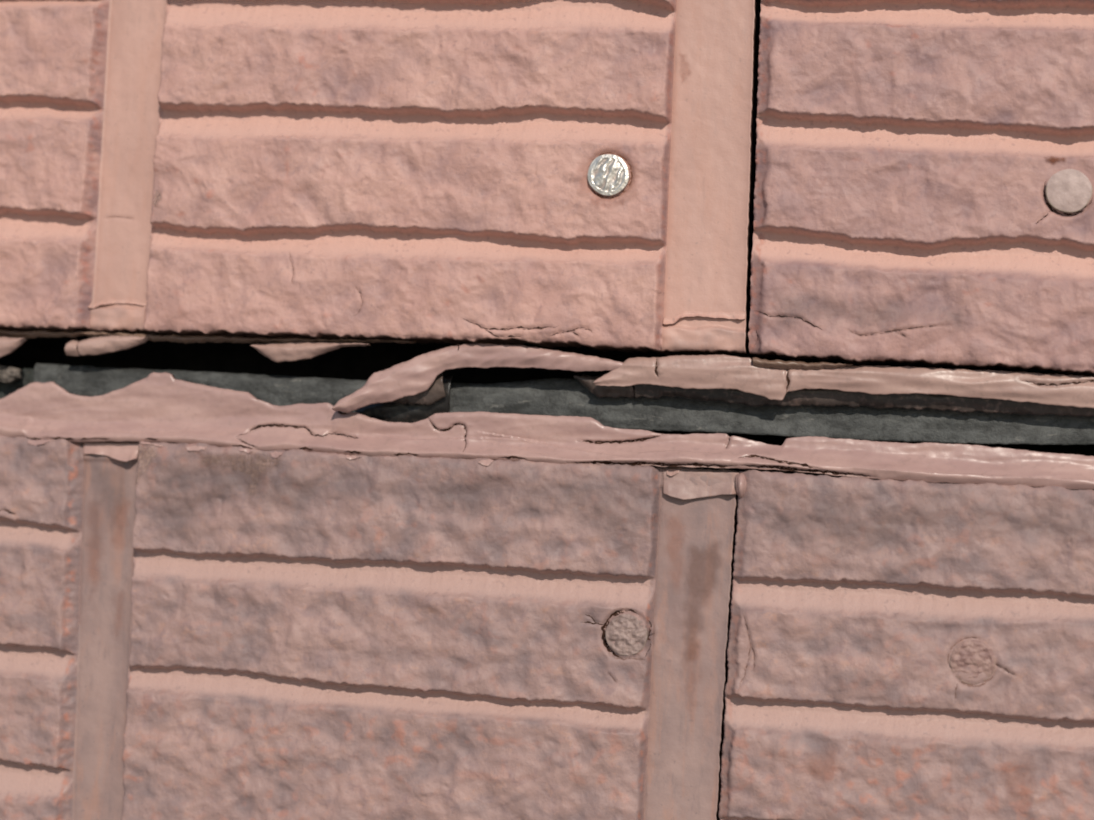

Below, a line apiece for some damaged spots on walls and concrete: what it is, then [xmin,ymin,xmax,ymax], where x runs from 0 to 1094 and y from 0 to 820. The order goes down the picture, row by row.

peeling [83,441,163,482]